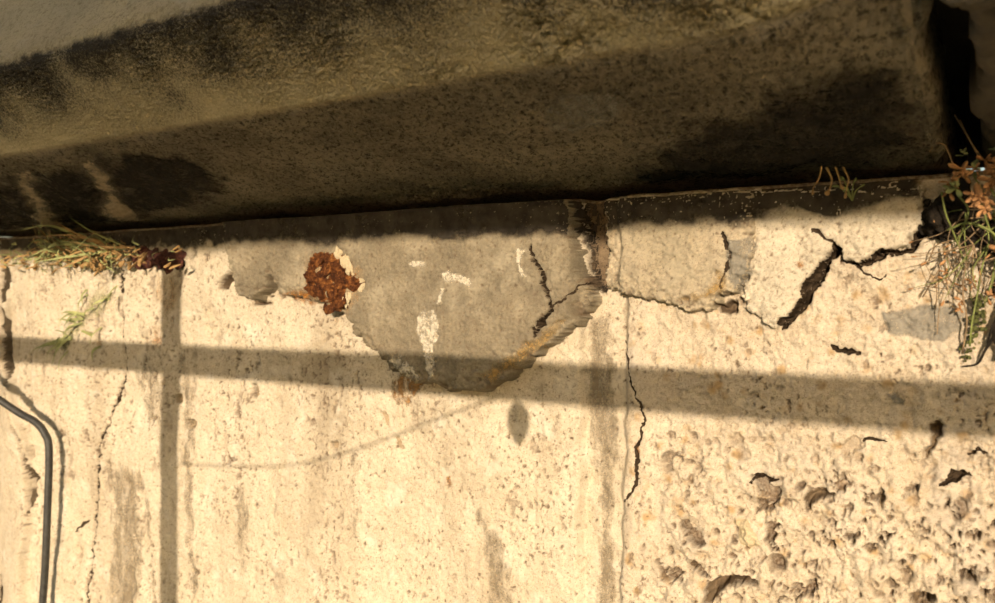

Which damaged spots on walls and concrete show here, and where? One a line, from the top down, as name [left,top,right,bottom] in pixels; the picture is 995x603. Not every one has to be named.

crack [0,255,15,390]
peeling [323,246,365,315]
crack [529,246,596,338]
crack [719,231,732,289]
crack [777,225,927,330]
crack [13,427,40,516]
crack [75,317,128,603]
crack [624,340,647,502]